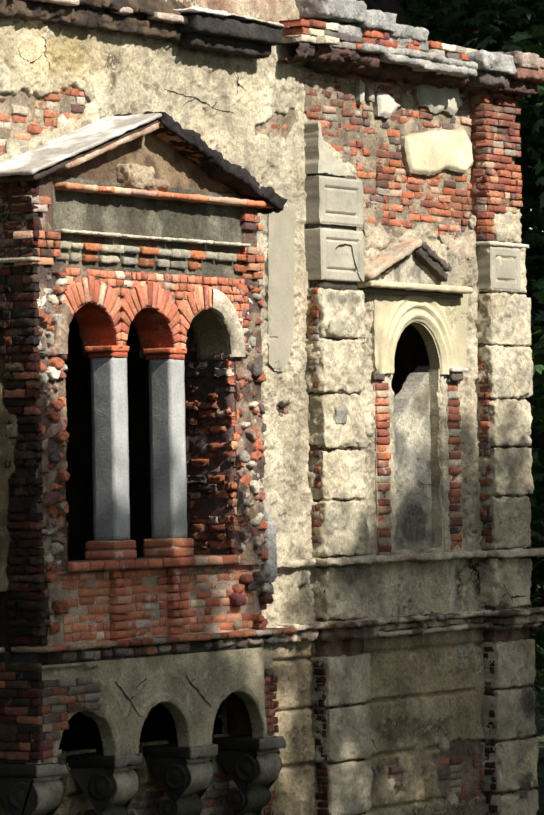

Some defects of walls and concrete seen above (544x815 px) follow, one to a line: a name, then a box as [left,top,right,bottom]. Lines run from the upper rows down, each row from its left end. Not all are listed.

spalling [0,80,98,158]
crack [165,71,243,113]
spalling [255,65,523,263]
crack [115,678,147,717]